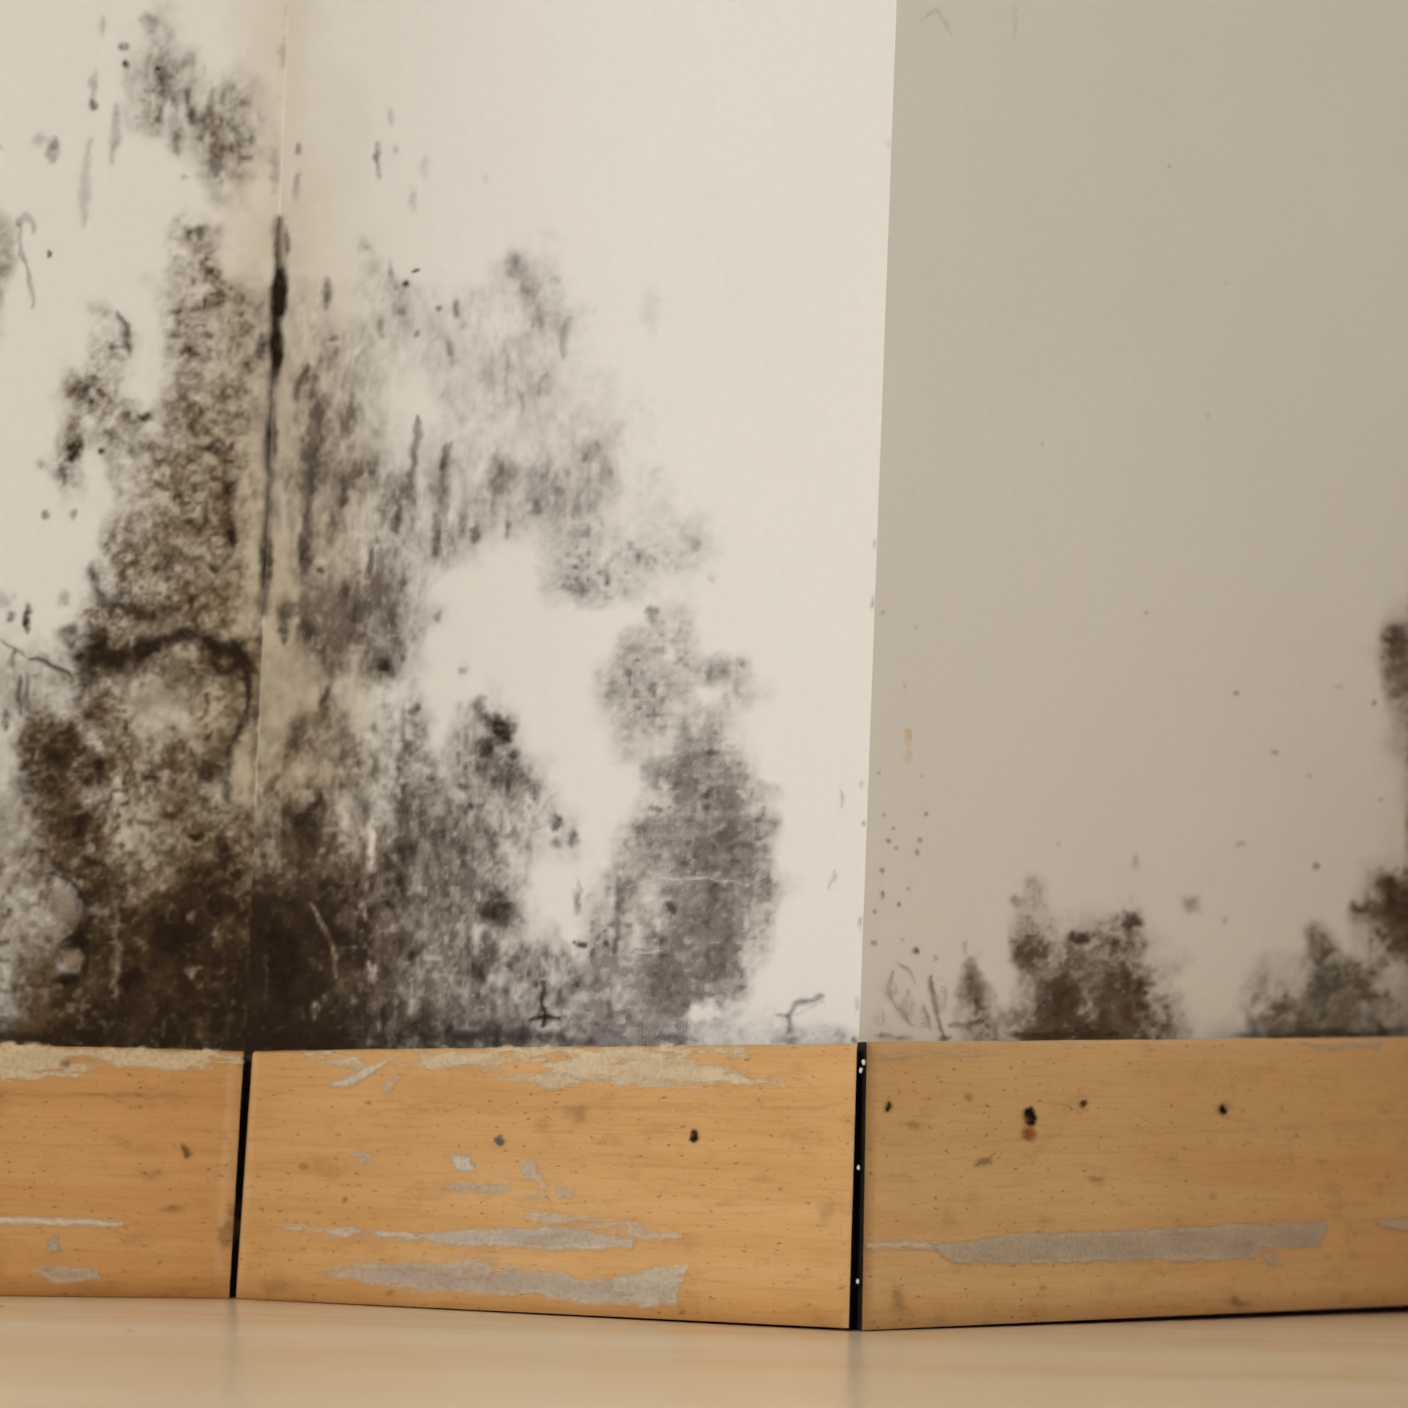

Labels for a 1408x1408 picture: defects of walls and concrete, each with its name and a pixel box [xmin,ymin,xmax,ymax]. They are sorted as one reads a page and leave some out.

water stain [155,67,252,161]
crack [29,657,72,677]
water stain [0,227,777,1061]
water stain [1374,624,1408,703]
water stain [1353,869,1408,963]
water stain [1013,915,1174,1041]
water stain [1253,933,1404,1038]
peeling [331,1059,399,1092]
peeling [451,1155,571,1197]
peeling [0,1217,124,1283]
peeling [287,1227,419,1240]
peeling [329,1260,688,1307]